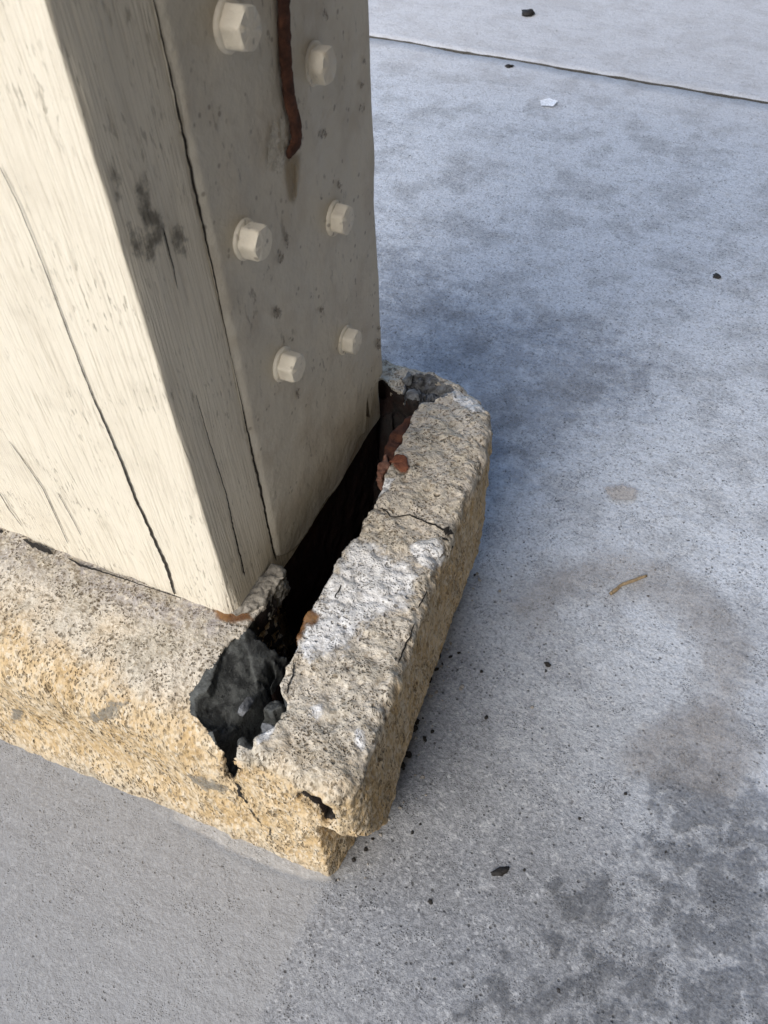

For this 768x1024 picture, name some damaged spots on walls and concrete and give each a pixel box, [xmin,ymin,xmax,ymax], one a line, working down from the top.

crack [0,168,180,598]
crack [196,396,245,576]
rust [376,454,409,491]
crack [380,508,453,549]
spalling [189,622,288,776]
spalling [301,790,336,820]